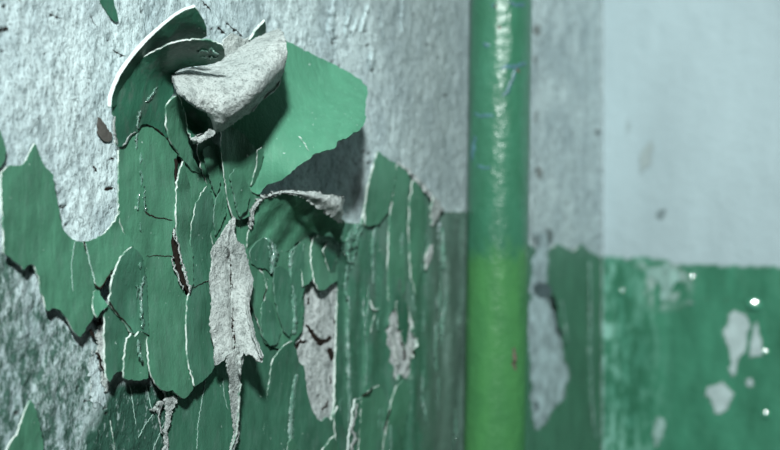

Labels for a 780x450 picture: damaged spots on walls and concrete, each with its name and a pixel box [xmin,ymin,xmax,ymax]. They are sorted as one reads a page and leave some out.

peeling [100,0,118,22]
crack [147,124,178,182]
crack [71,241,132,330]
crack [145,211,209,293]
peeling [0,5,448,450]
crack [259,269,268,301]
spalling [527,230,570,431]
spalling [705,311,763,415]
crack [129,385,165,450]
crack [196,380,228,446]